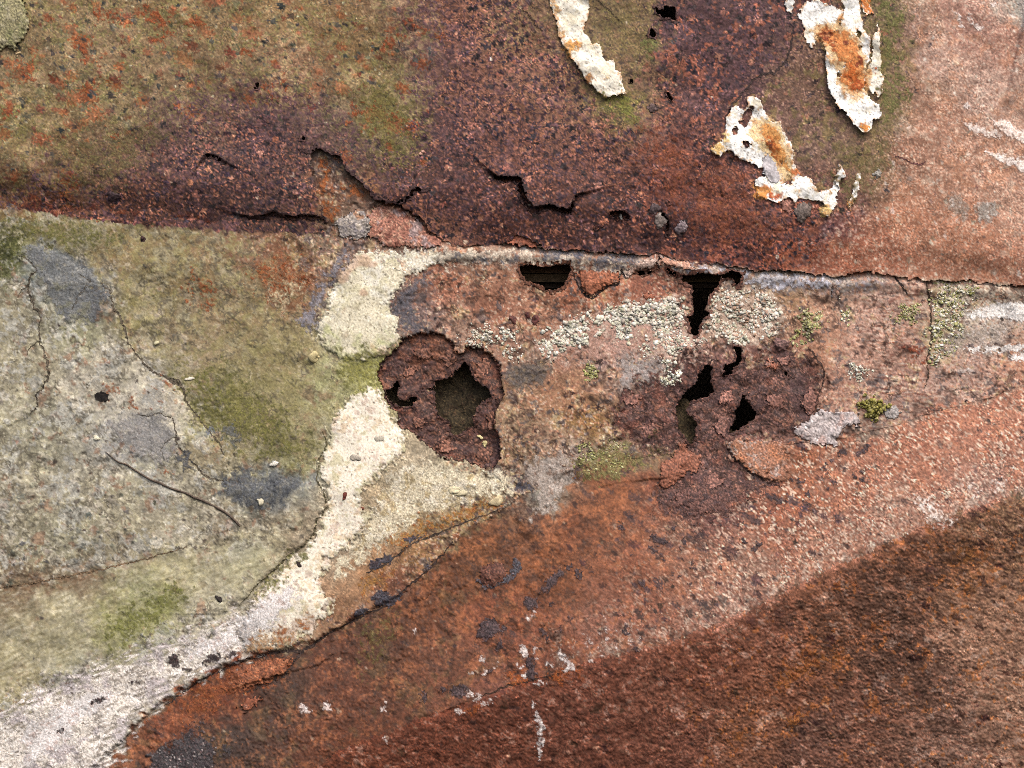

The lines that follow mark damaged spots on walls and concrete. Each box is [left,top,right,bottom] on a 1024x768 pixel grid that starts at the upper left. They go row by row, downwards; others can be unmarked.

peeling [550,0,633,98]
peeling [784,0,884,133]
rust [809,13,877,102]
crack [239,209,328,223]
rust [316,156,441,251]
rust [636,117,800,248]
peeling [711,95,861,216]
crack [571,268,625,299]
spalling [687,289,714,336]
rust [725,435,795,482]
crack [241,431,328,603]
crack [165,508,501,705]